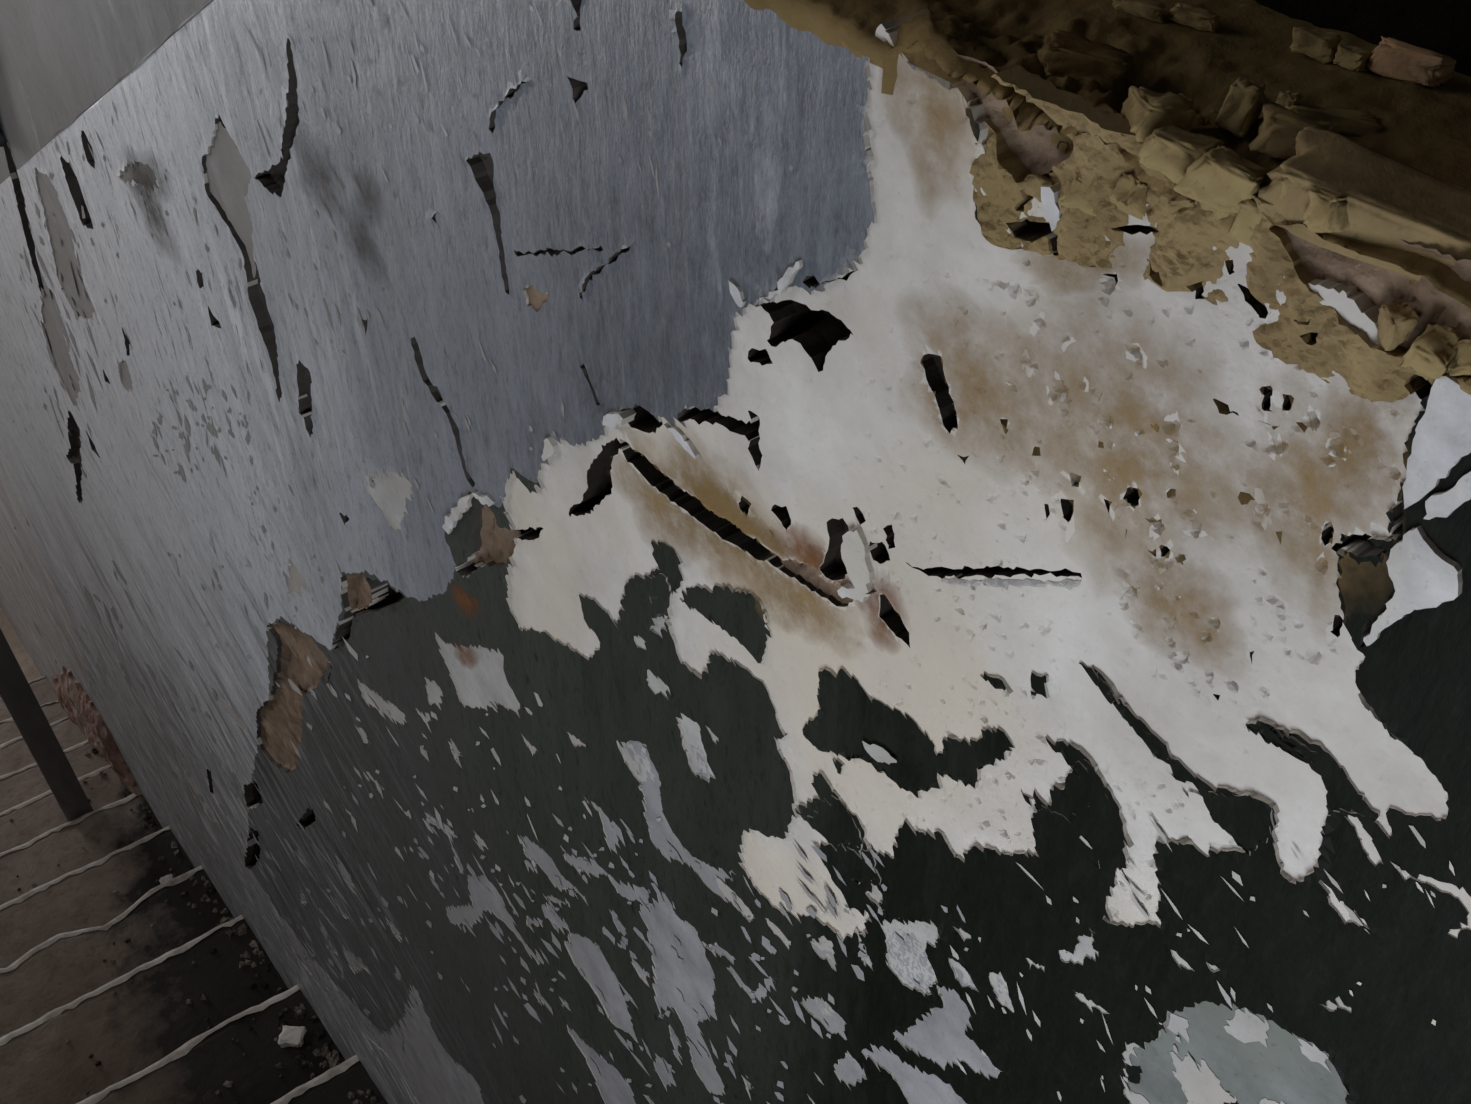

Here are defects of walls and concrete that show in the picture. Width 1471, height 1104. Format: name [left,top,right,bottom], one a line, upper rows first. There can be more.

peeling [193,16,371,339]
peeling [12,115,117,499]
crack [522,246,630,279]
crack [468,505,543,565]
crack [588,410,663,506]
flaking render [313,0,1471,1104]
water stain [953,352,1006,425]
water stain [1090,391,1205,509]
water stain [1284,418,1380,564]
crack [252,573,405,865]
peeling [276,634,543,770]
peeling [52,586,484,1104]